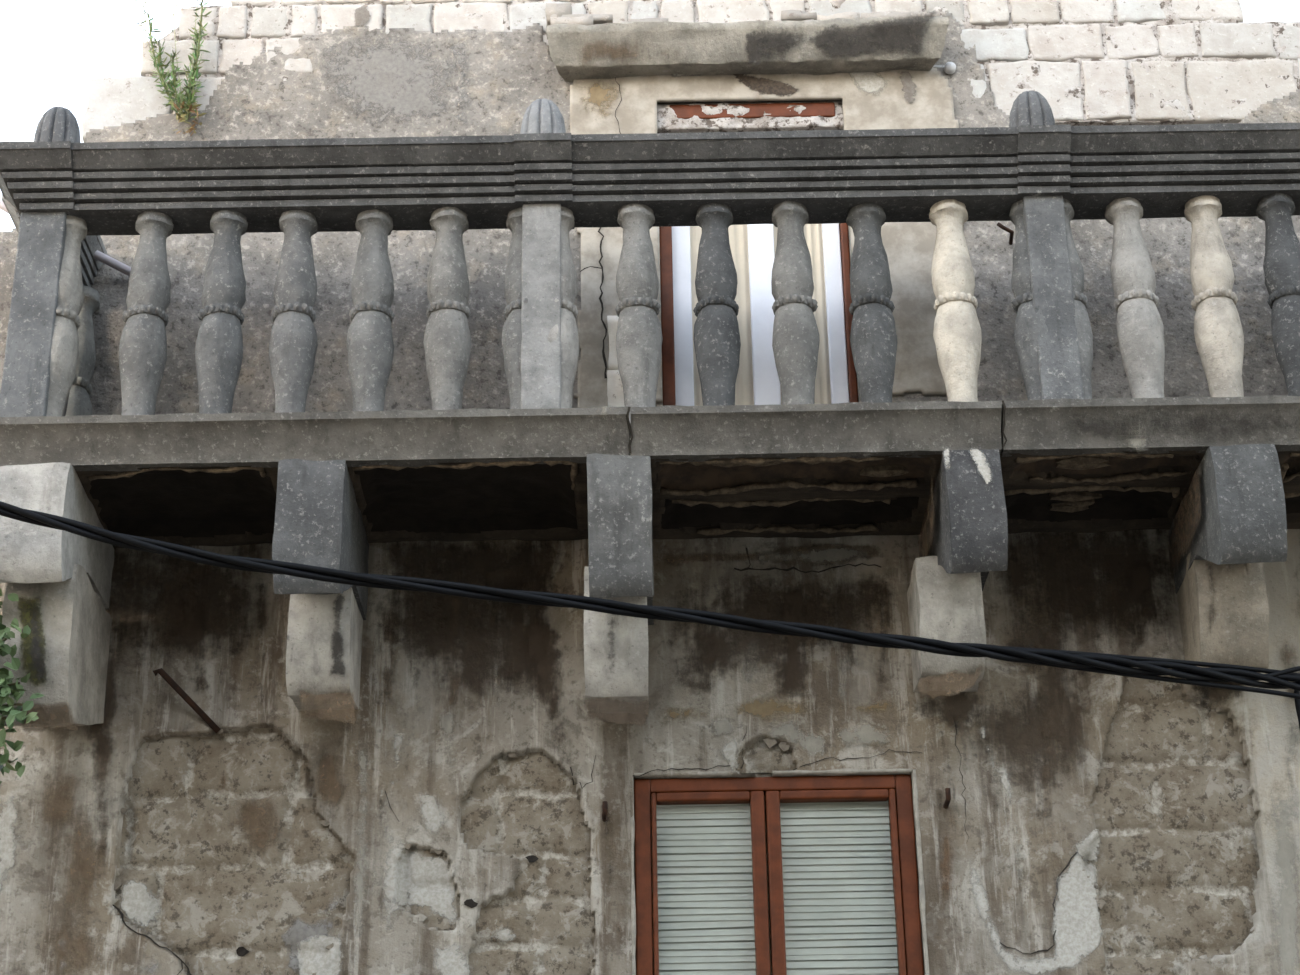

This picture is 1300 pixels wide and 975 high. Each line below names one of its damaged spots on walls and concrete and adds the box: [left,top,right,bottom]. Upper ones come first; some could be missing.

spalling [658,448,950,535]
peeling [971,449,991,484]
spalling [1004,453,1194,522]
water stain [331,594,345,675]
water stain [383,540,562,763]
water stain [584,698,650,725]
water stain [668,576,890,721]
water stain [917,470,1201,807]
flaking render [114,728,354,975]
flaking render [383,752,595,975]
flaking render [970,668,1260,975]
crack [113,905,192,975]